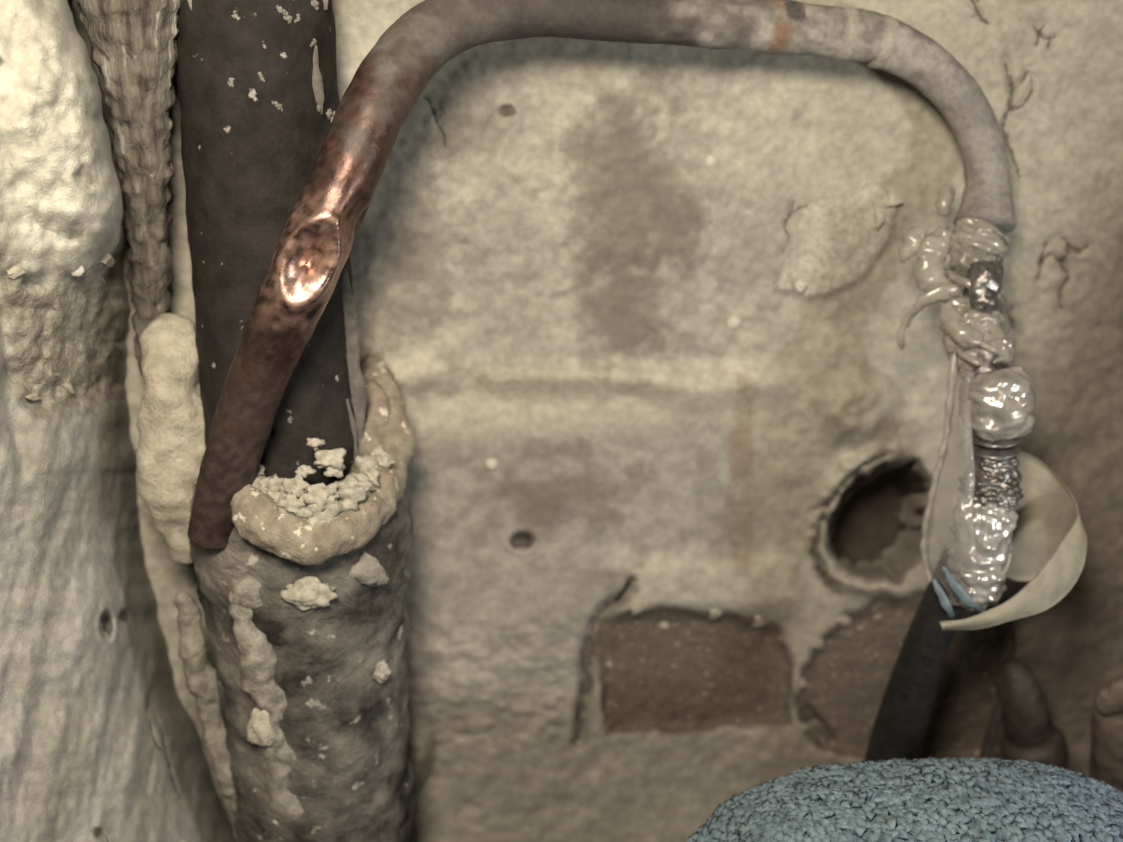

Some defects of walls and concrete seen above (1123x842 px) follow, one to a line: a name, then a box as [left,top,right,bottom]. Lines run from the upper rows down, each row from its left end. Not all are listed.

crack [970,0,988,25]
crack [1001,23,1057,178]
leakage [584,99,692,348]
crack [1036,236,1089,309]
spalling [818,463,927,565]
spalling [594,591,924,759]
spalling [919,601,1015,759]